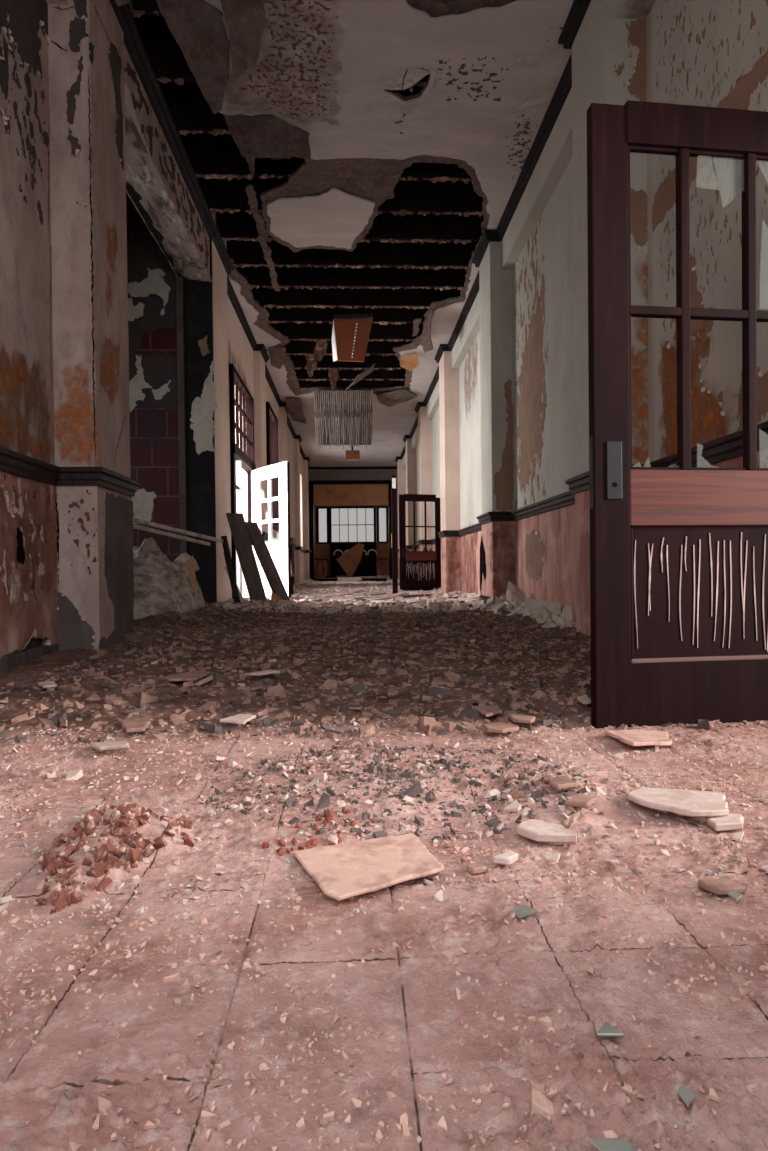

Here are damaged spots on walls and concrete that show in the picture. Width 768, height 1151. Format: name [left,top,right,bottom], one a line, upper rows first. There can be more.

peeling [0,0,59,225]
peeling [66,0,209,269]
peeling [614,0,768,112]
corrosion [54,339,119,465]
peeling [127,239,217,455]
peeling [493,214,548,511]
flaking render [0,473,156,658]